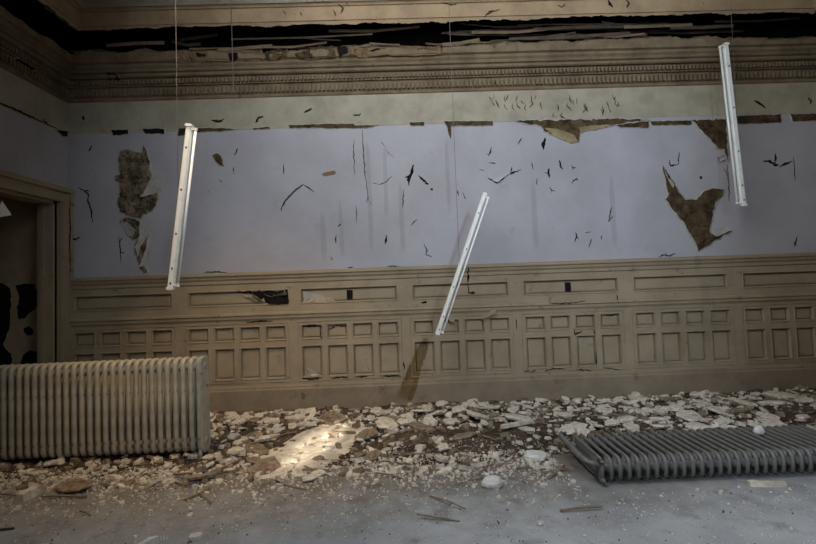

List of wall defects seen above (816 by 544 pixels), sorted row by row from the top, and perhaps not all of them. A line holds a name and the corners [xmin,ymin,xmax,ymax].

peeling [172,44,441,63]
crack [0,102,57,129]
peeling [515,117,650,144]
peeling [692,118,730,163]
peeling [114,144,163,274]
crack [281,165,314,211]
peeling [661,165,732,252]
peeling [0,282,37,365]